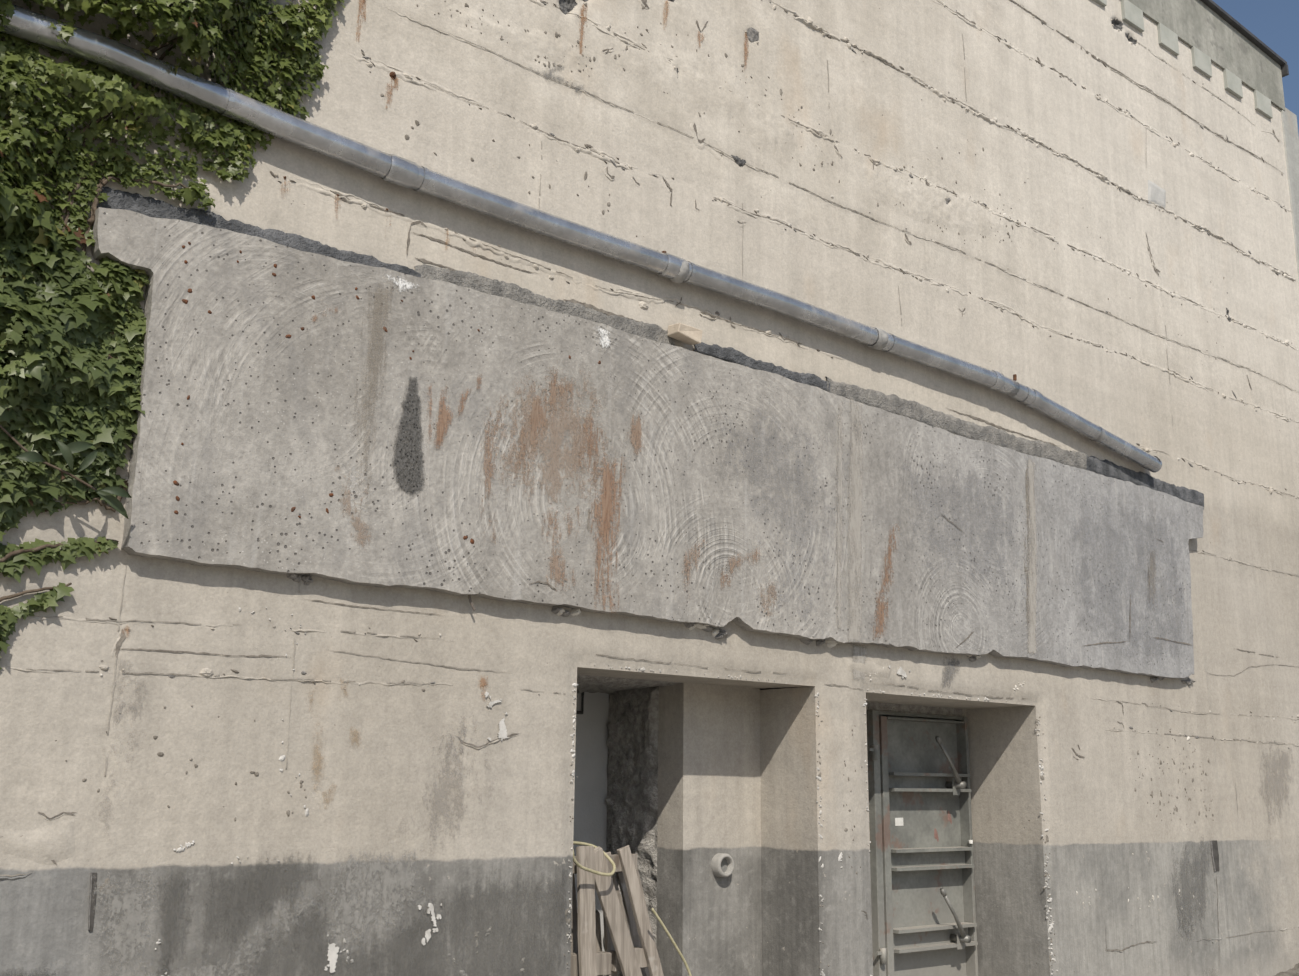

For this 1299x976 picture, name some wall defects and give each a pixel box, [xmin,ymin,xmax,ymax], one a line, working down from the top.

leakage [393,377,424,494]
rust [630,415,642,455]
rust [482,370,622,609]
rust [873,527,896,639]
crack [1209,649,1296,676]
peeling [484,692,508,741]
leakage [255,880,565,976]
peeling [417,903,442,946]
crack [1105,923,1158,952]